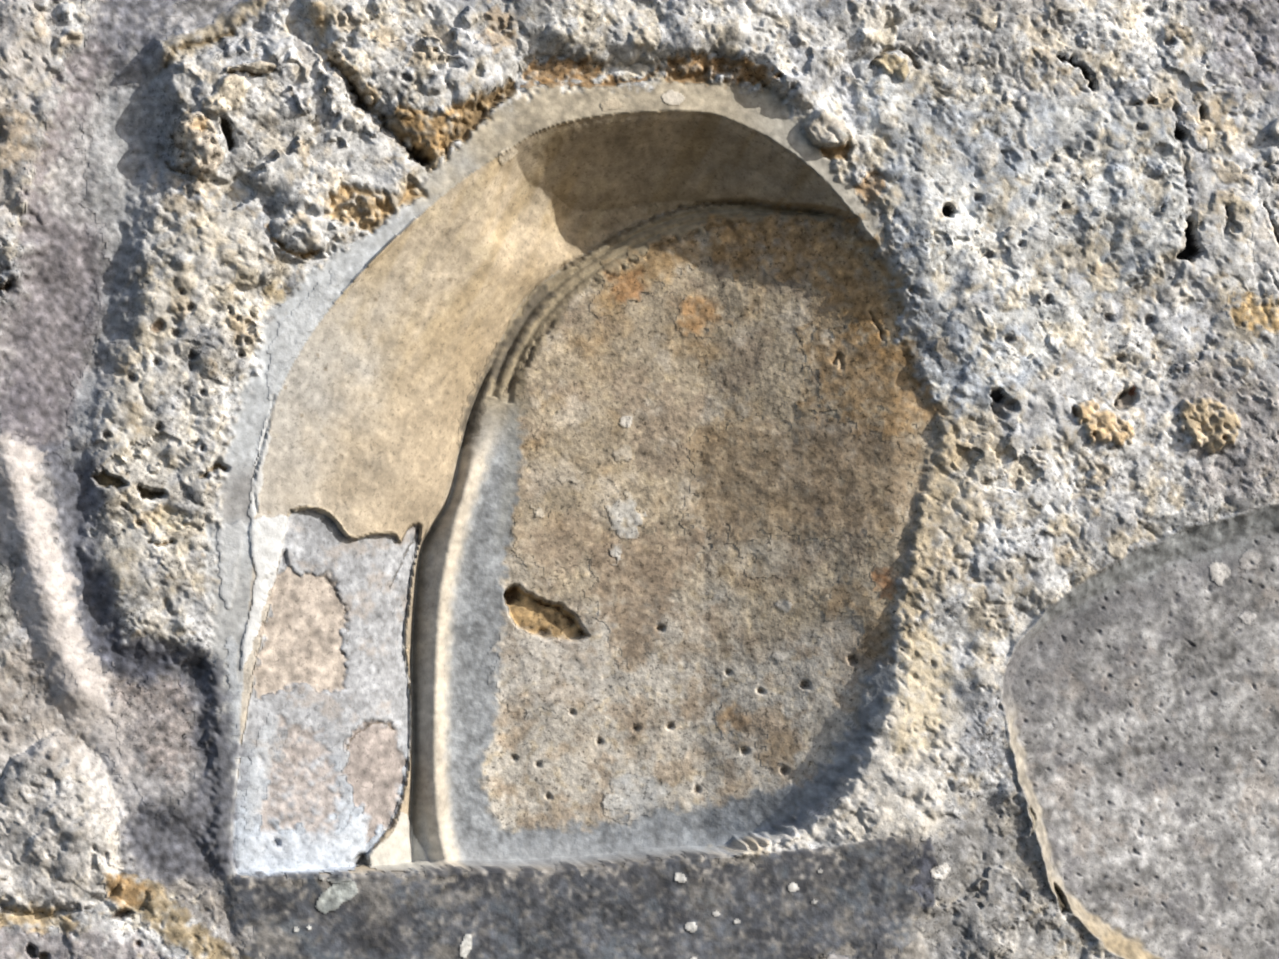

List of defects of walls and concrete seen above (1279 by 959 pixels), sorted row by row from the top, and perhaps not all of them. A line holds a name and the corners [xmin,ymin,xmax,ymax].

spalling [151,319,180,338]
spalling [217,268,437,877]
spalling [504,586,520,604]
peeling [536,600,587,636]